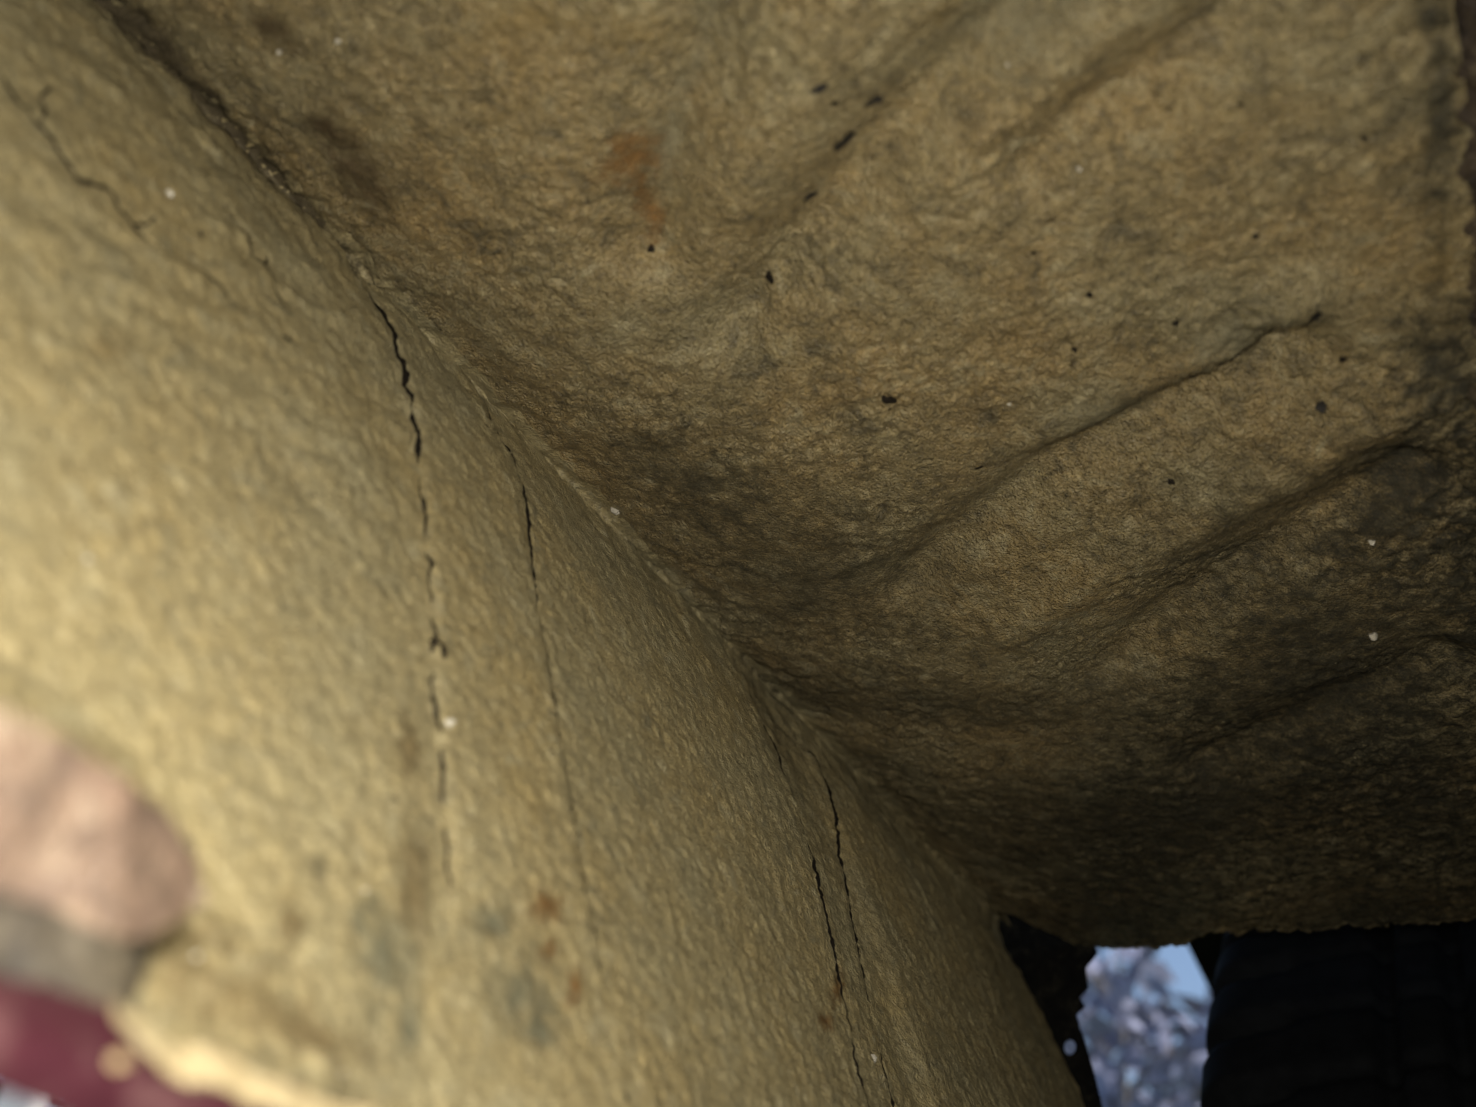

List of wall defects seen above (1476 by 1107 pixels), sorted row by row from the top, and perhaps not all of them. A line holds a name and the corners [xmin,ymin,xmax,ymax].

crack [366,288,452,888]
crack [486,406,604,980]
crack [763,724,895,1107]